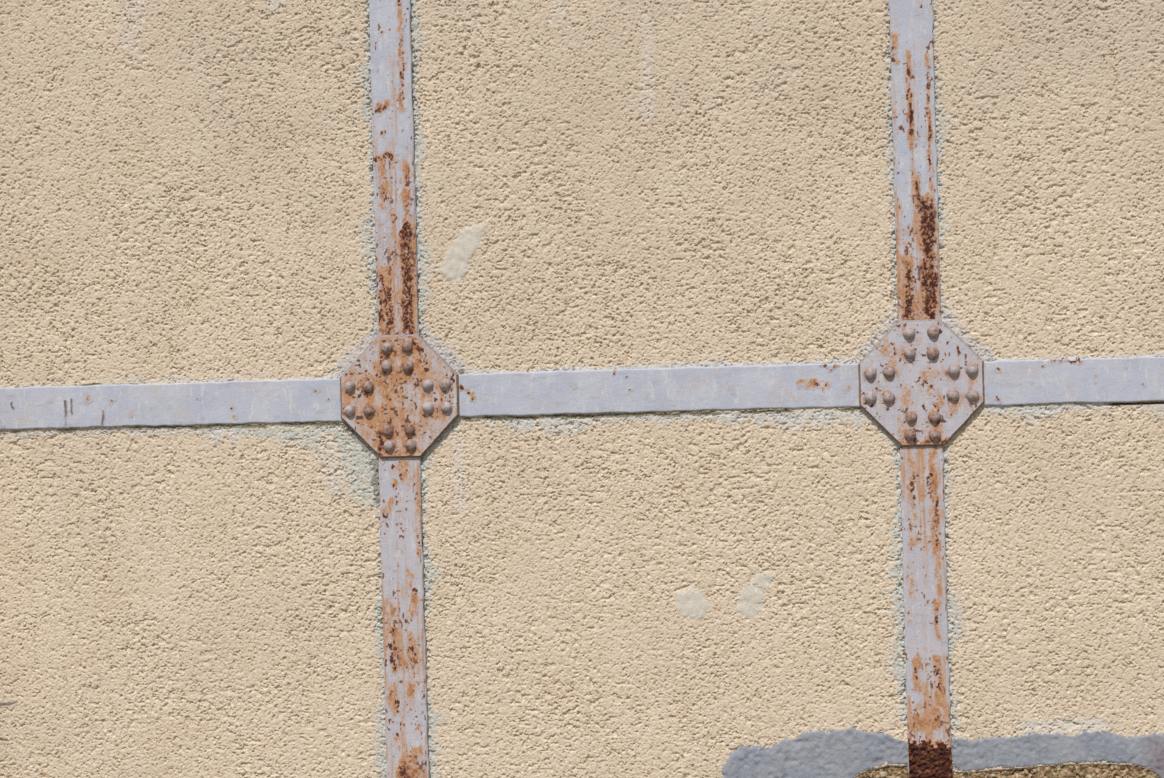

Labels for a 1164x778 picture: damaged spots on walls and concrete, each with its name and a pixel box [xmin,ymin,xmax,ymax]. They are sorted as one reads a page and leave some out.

rust [312,0,477,778]
spalling [856,766,909,778]
rust [796,0,1002,778]
spalling [952,763,1159,778]